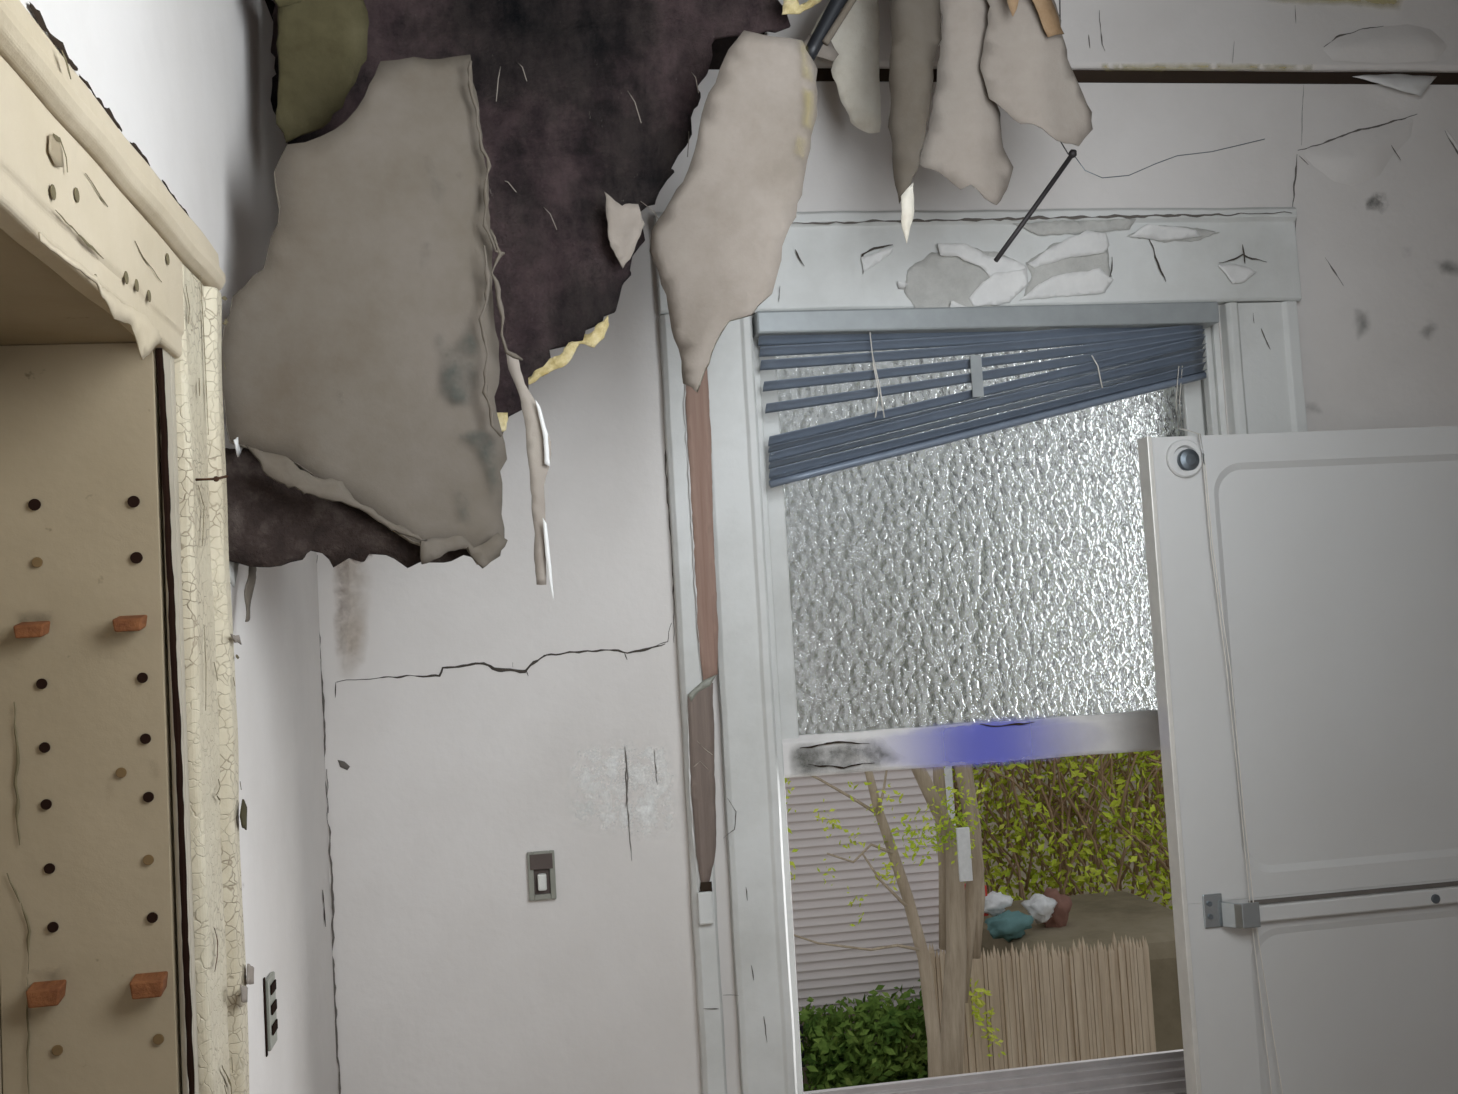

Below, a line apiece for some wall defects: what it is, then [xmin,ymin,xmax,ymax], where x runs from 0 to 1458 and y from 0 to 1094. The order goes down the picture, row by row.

peeling [861,246,894,271]
peeling [898,219,1220,308]
peeling [229,561,257,659]
crack [319,451,675,1094]
peeling [240,964,254,1003]